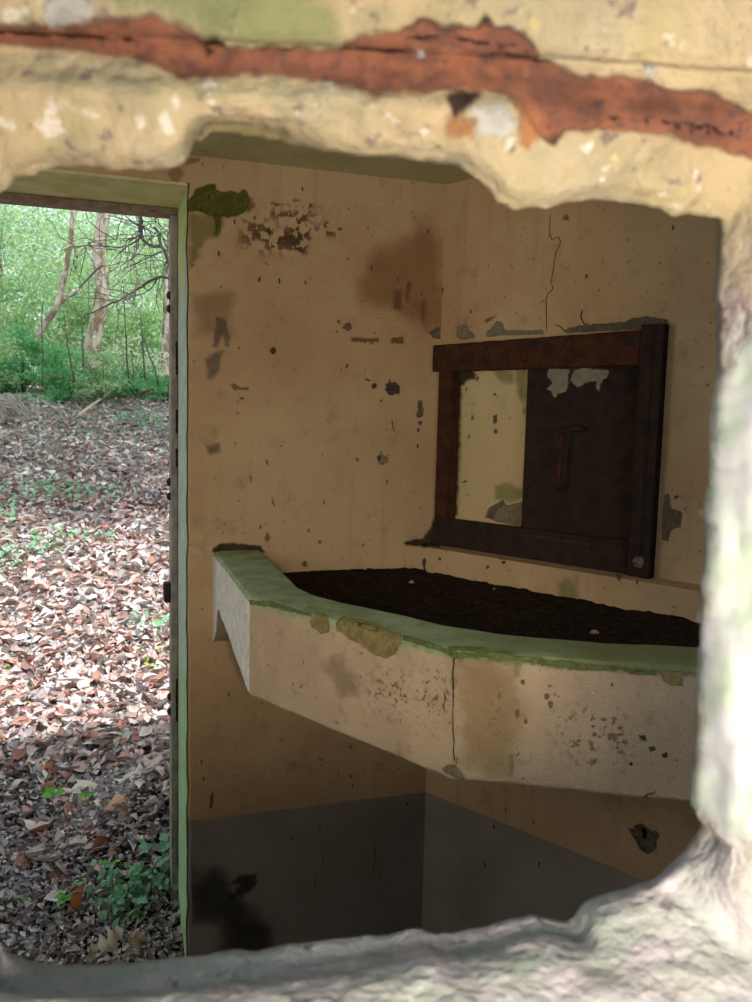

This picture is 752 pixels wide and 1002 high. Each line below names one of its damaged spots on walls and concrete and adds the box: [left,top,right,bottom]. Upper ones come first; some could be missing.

crack [542,225,587,332]
spalling [457,322,543,340]
spalling [564,316,668,333]
spalling [310,613,401,658]
crack [437,658,458,764]
hole [628,823,659,854]